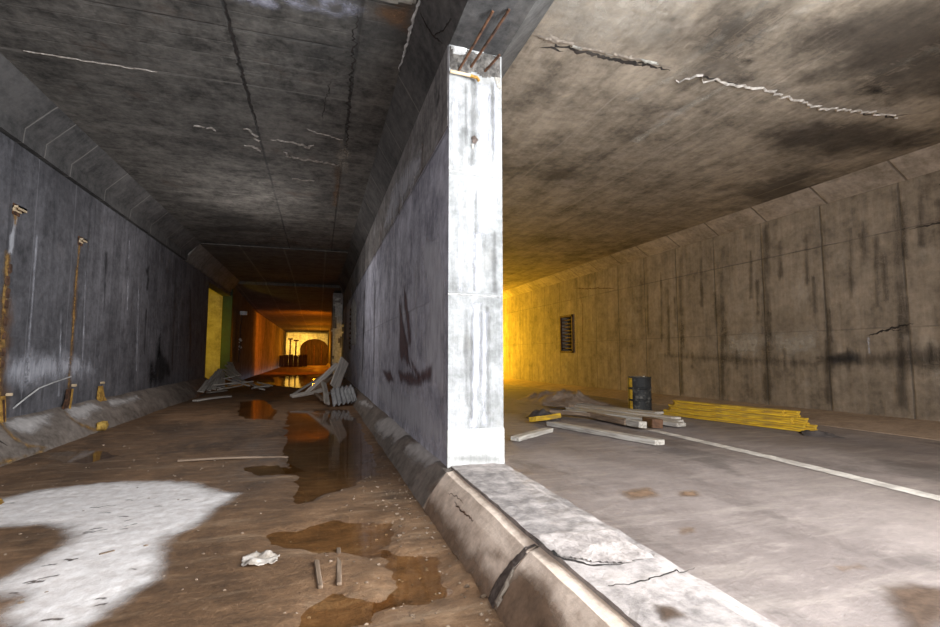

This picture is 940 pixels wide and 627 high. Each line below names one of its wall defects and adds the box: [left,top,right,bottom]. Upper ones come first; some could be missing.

crack [23,50,156,72]
crack [223,0,359,181]
crack [398,0,451,71]
crack [541,40,907,119]
corrosion [0,215,17,396]
crack [608,567,695,586]